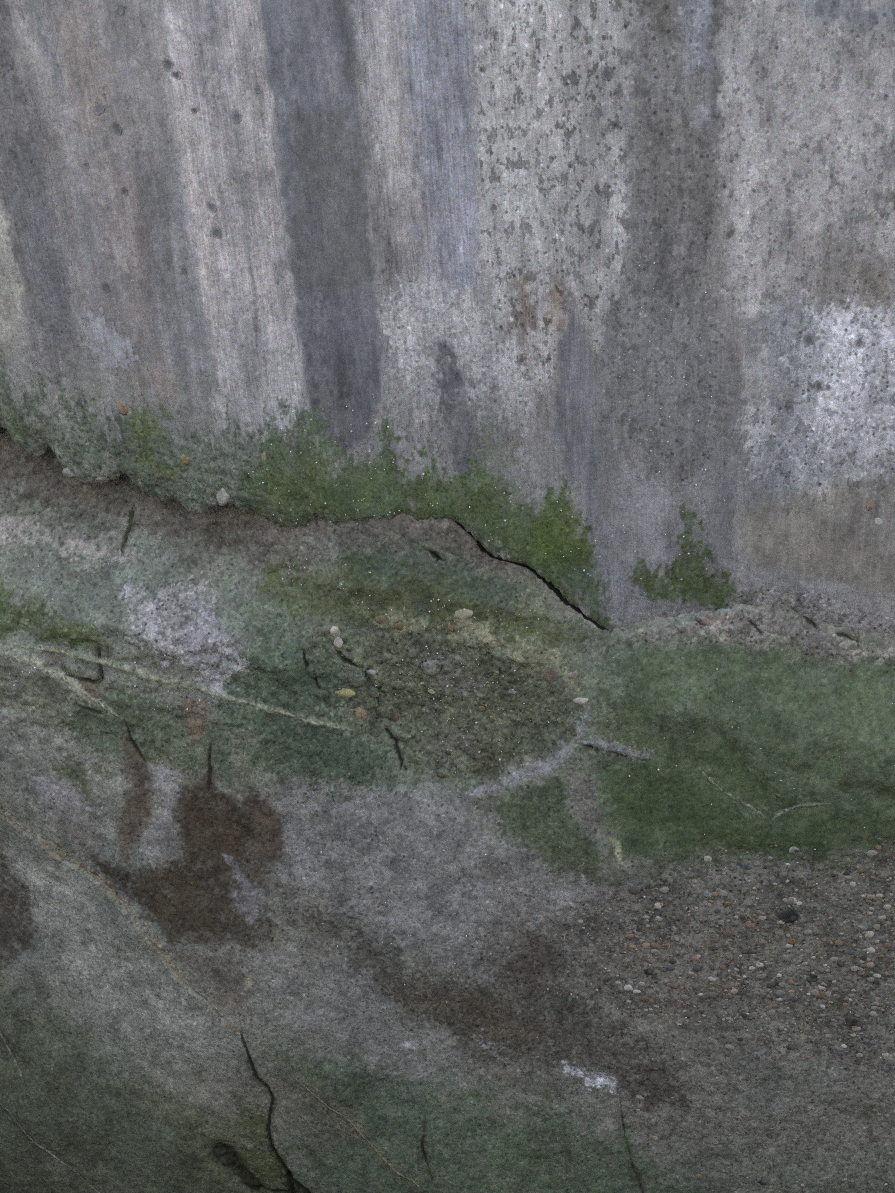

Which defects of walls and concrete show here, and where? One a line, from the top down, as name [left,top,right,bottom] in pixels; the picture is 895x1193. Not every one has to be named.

damp [0,0,147,396]
damp [159,0,895,620]
crack [121,509,134,556]
crack [428,550,444,561]
crack [455,521,608,630]
damp [363,604,586,692]
damp [137,759,186,865]
damp [219,852,263,930]
damp [608,836,624,865]
crack [240,1033,310,1193]